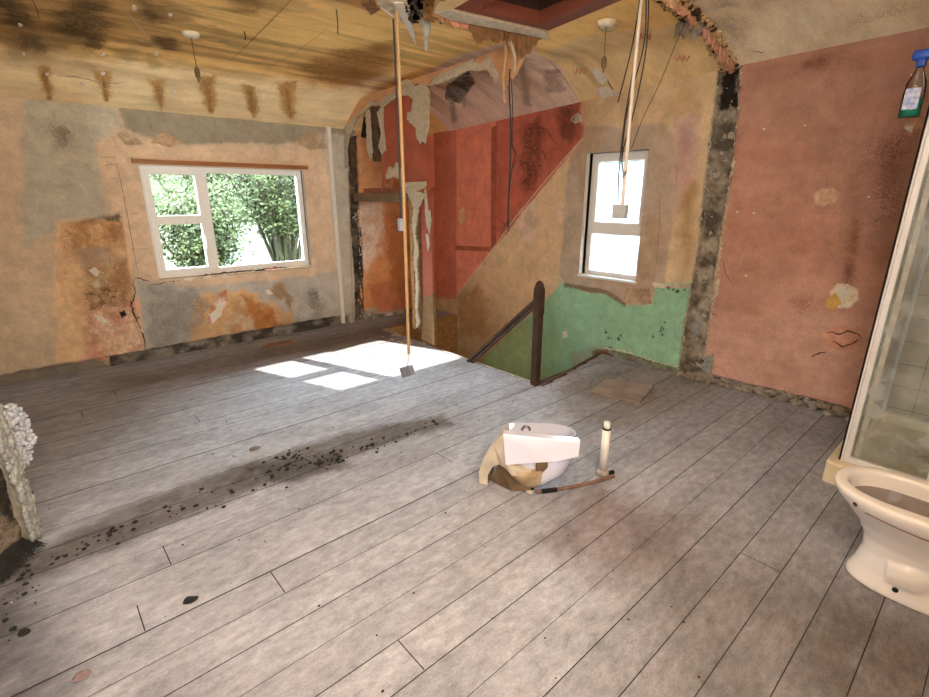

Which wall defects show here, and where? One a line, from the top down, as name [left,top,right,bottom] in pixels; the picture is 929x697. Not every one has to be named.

water stain [0,0,187,102]
water stain [146,77,168,111]
water stain [197,73,221,113]
water stain [236,82,260,118]
peeling [424,189,432,251]
flaking render [652,68,851,421]
flaking render [825,283,859,311]
flaking render [3,403,38,473]